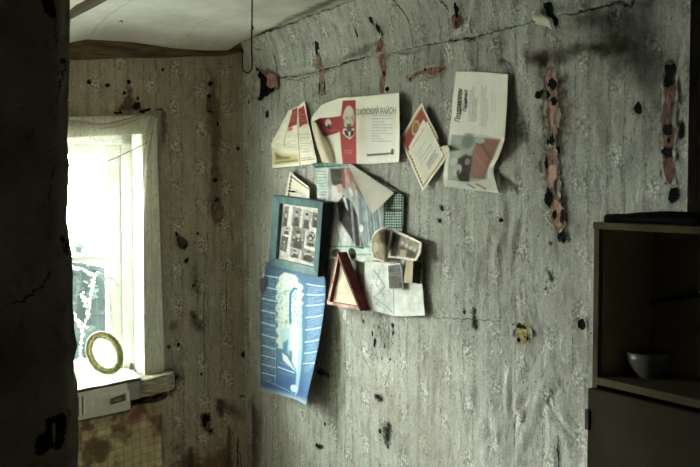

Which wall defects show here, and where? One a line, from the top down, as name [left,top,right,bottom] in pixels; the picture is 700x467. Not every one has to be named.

crack [255,1,352,36]
crack [560,0,635,16]
crack [273,0,533,98]